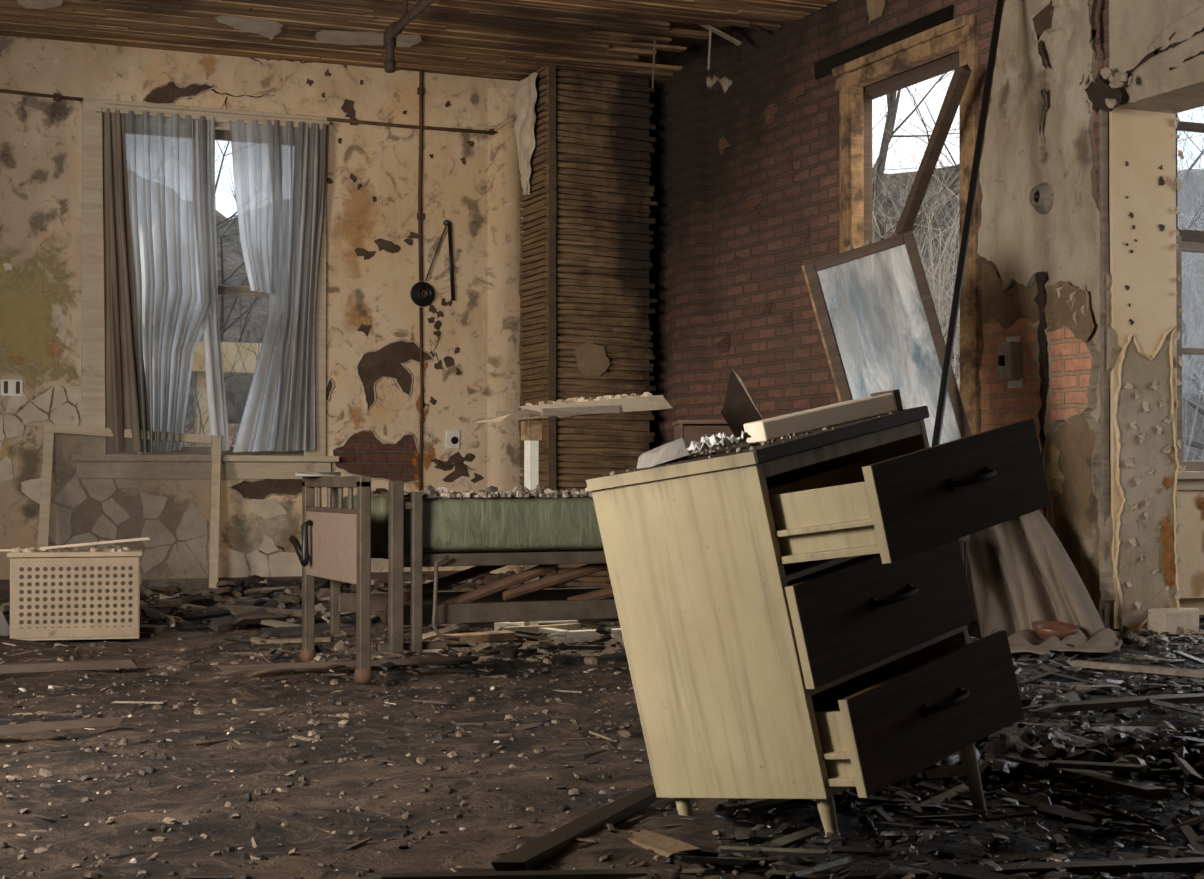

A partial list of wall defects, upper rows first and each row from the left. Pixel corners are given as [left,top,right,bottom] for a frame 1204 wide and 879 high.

crack [1123,27,1204,82]
flaking render [142,80,217,105]
flaking render [1159,165,1183,214]
peeling [355,232,418,260]
peeling [428,298,453,337]
flaking render [355,324,462,413]
flaking render [330,429,484,486]
peeling [980,277,1186,636]